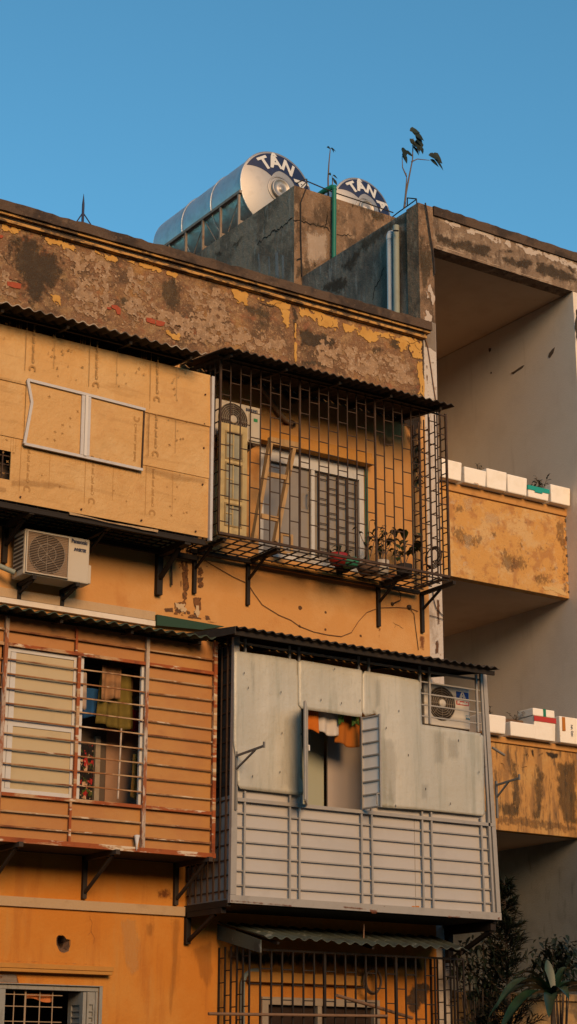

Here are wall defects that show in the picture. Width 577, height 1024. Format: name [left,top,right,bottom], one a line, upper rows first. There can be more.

flaking render [0,224,21,302]
water stain [9,236,64,306]
crack [257,215,352,245]
peeling [443,220,577,271]
flaking render [41,235,425,396]
peeling [424,285,435,322]
flaking render [174,561,210,619]
water stain [500,763,520,816]
water stain [532,750,577,823]